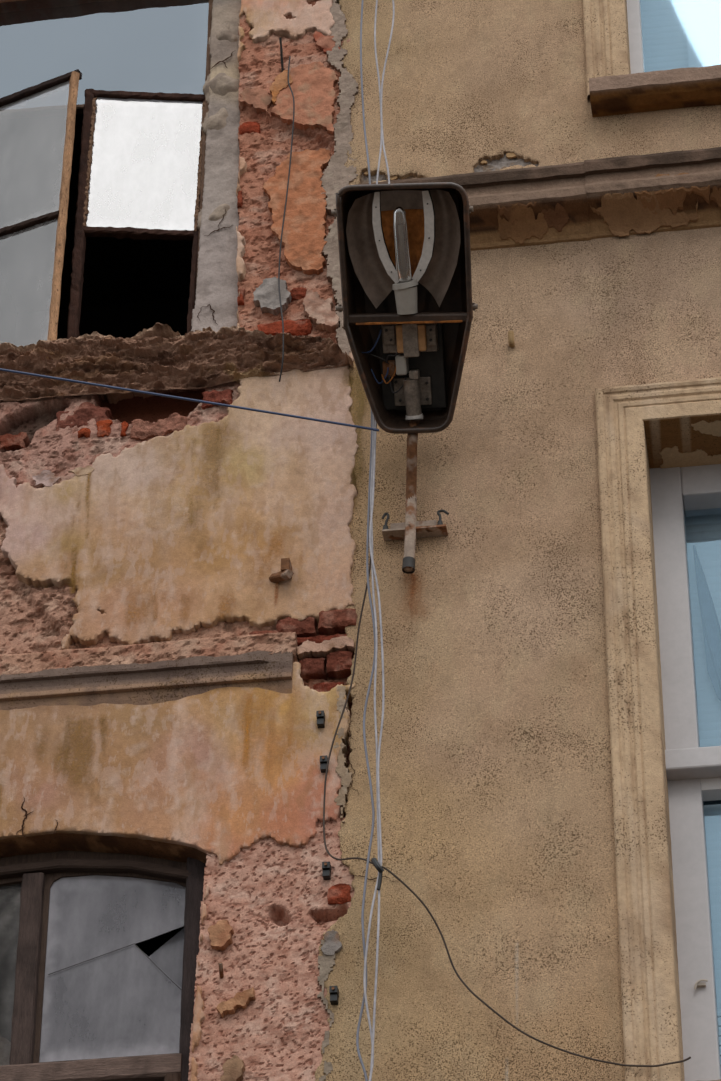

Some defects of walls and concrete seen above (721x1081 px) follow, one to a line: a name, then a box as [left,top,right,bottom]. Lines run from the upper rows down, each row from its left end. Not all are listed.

flaking render [237,13,351,344]
peeling [474,152,539,172]
peeling [497,201,569,245]
flaking render [0,381,241,488]
peeling [659,446,721,468]
peeling [691,420,721,437]
flaking render [0,518,358,692]
flaking render [188,818,355,1081]